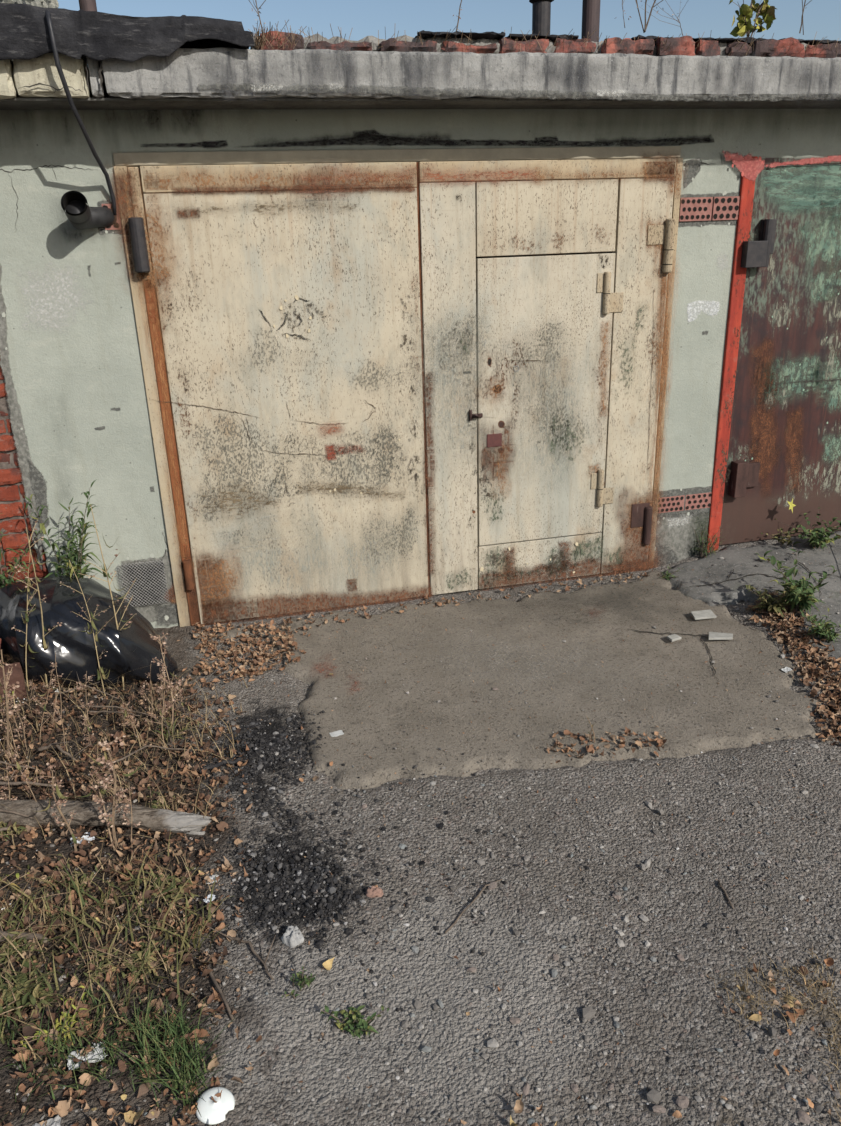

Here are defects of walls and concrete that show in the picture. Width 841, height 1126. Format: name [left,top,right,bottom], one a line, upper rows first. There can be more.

spalling [0,265,49,568]
crack [0,164,91,225]
rust [114,153,684,626]
peeling [678,151,841,506]